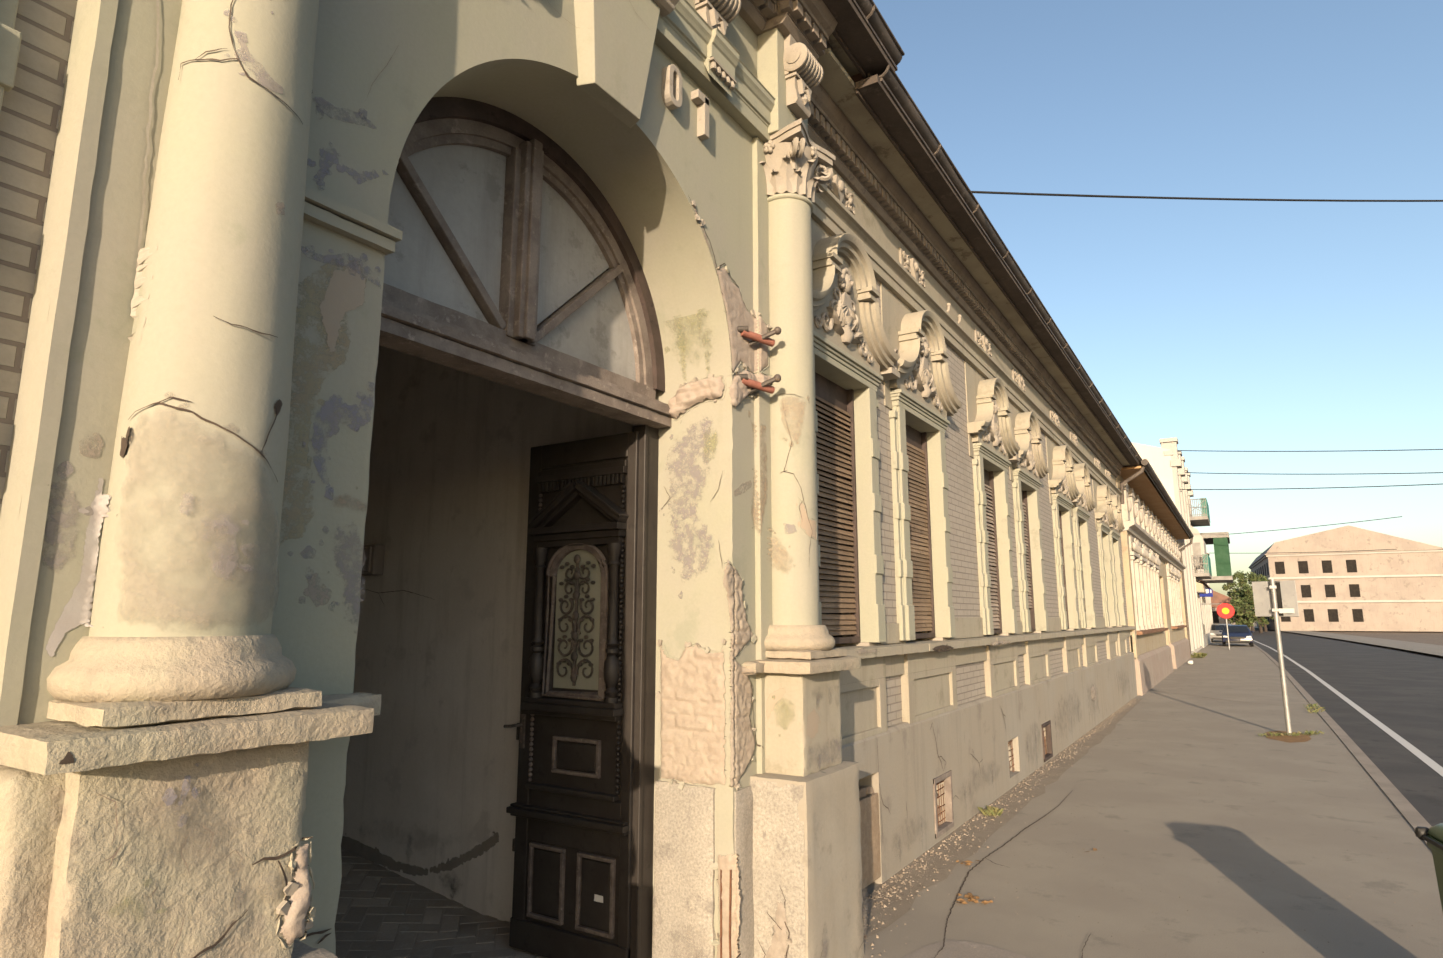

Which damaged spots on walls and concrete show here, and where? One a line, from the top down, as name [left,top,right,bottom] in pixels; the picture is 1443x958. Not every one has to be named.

crack [127,0,303,364]
crack [128,396,280,482]
spalling [661,200,773,599]
crack [776,393,812,549]
spalling [655,559,788,791]
crack [96,792,122,871]
crack [140,825,331,958]
spalling [276,838,316,949]